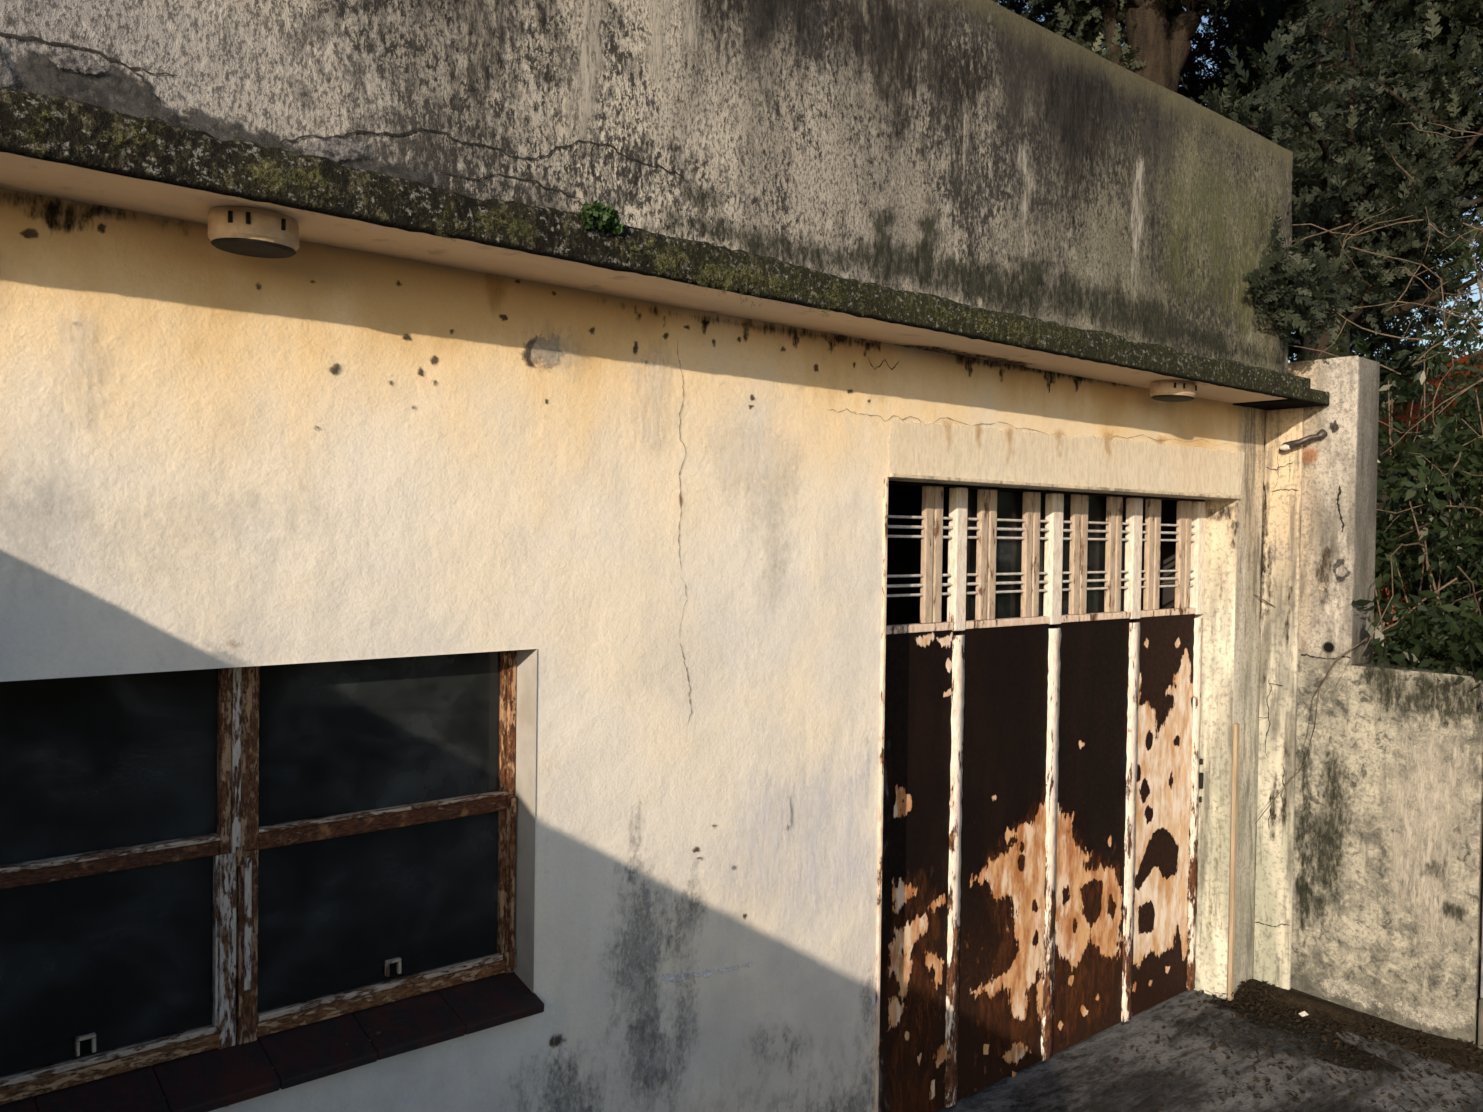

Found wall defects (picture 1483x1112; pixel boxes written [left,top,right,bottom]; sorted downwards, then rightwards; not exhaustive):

crack [0,32,178,103]
leakage [460,0,551,103]
leakage [565,0,602,148]
leakage [827,0,993,169]
leakage [4,194,126,238]
leakage [688,186,716,222]
leakage [873,211,895,252]
leakage [916,212,940,275]
leakage [1012,146,1051,300]
leakage [1131,159,1144,276]
crack [677,340,692,722]
leakage [613,867,697,1094]